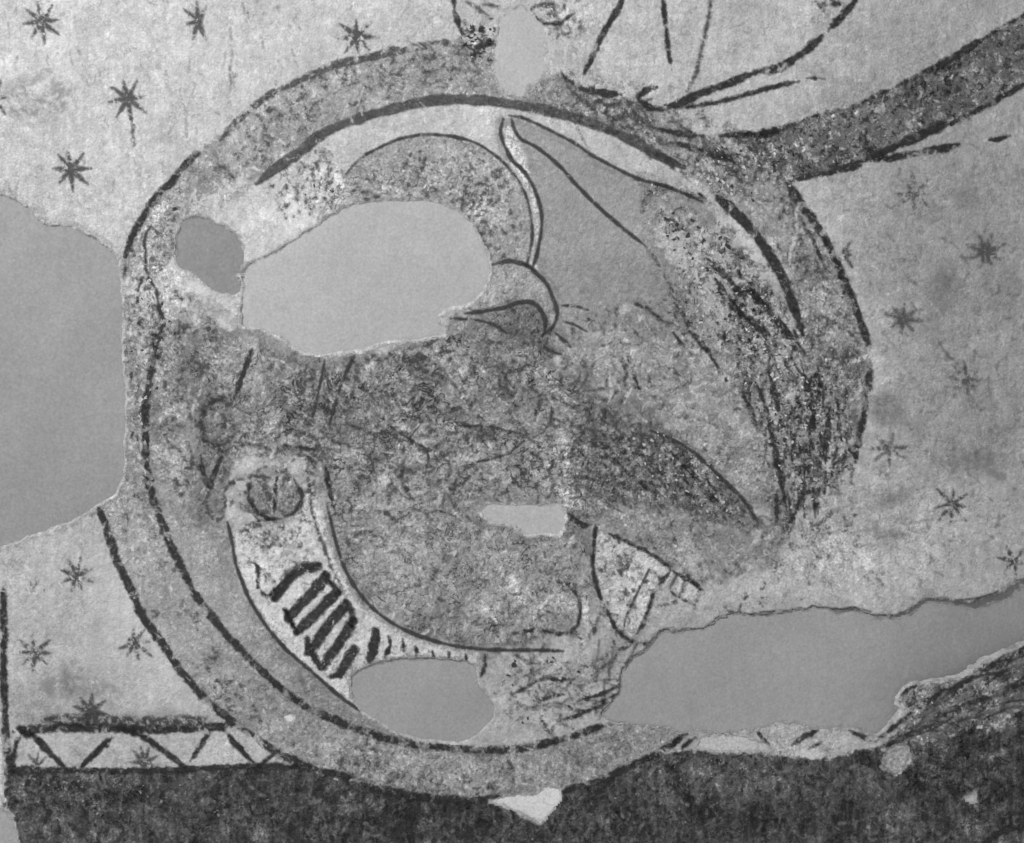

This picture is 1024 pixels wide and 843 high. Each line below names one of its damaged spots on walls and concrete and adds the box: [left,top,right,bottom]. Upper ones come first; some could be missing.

flaking render [461,5,547,95]
flaking render [176,155,494,360]
flaking render [0,189,171,547]
flaking render [476,502,569,538]
flaking render [493,787,561,824]